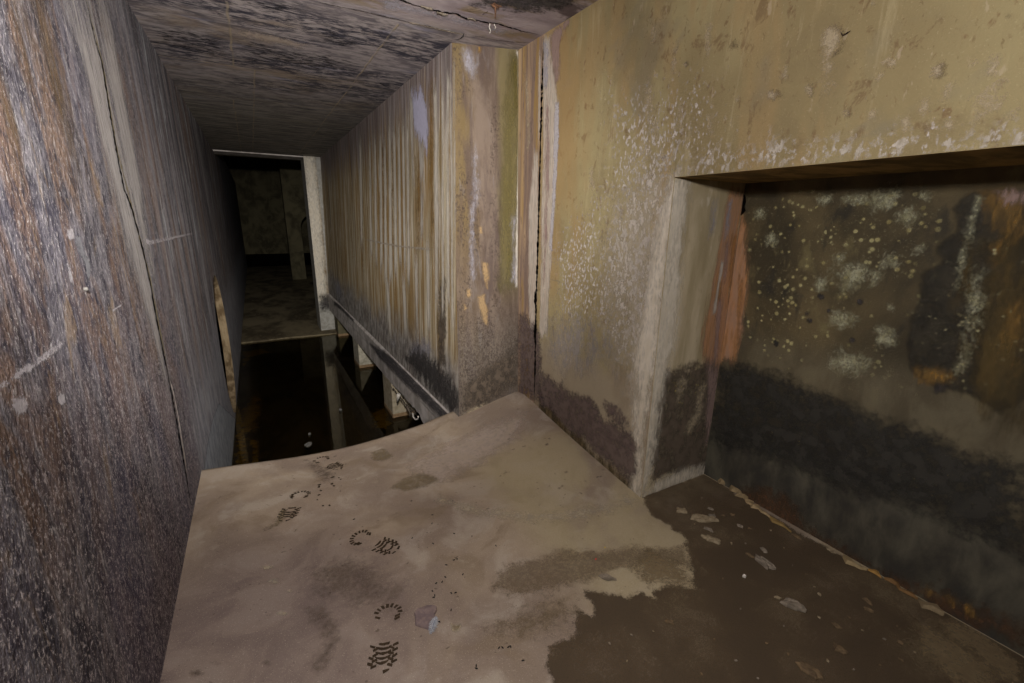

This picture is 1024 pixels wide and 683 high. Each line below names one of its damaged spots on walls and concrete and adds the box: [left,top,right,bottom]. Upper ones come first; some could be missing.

leakage [303,156,354,321]
crack [320,0,543,395]
leakage [359,0,1024,683]
rust [703,189,747,442]